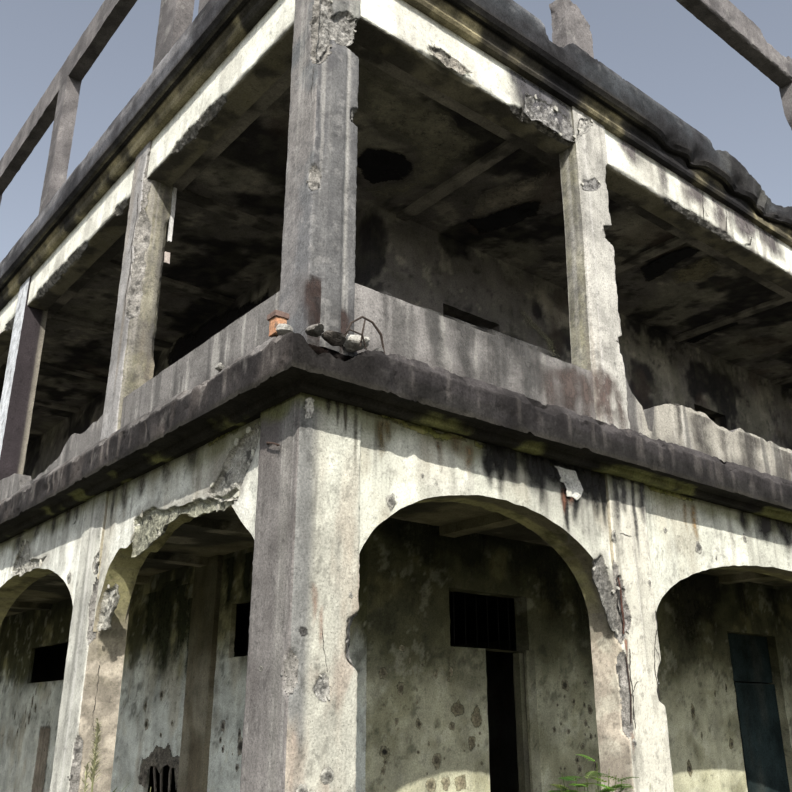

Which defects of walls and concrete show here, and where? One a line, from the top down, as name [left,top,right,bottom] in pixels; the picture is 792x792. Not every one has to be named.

spalling [309,0,359,64]
spalling [428,44,472,74]
spalling [510,93,593,146]
leakage [357,148,413,184]
leakage [426,309,443,363]
leakage [455,319,543,399]
leakage [693,413,708,449]
spalling [130,423,261,557]
leakage [483,442,644,538]
flaking render [555,466,583,500]
leakage [757,515,791,547]
spalling [591,555,637,748]